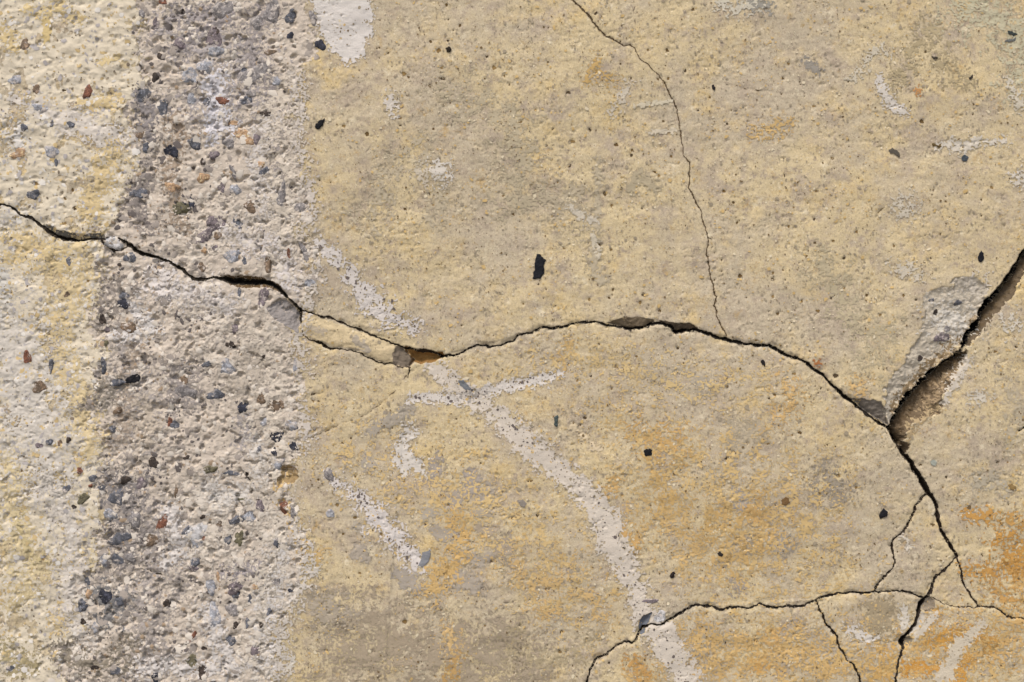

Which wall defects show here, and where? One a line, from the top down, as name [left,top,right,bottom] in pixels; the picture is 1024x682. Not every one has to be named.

crack [0,203,109,246]
crack [109,0,1024,430]
spalling [851,251,1024,452]
crack [586,432,1024,682]